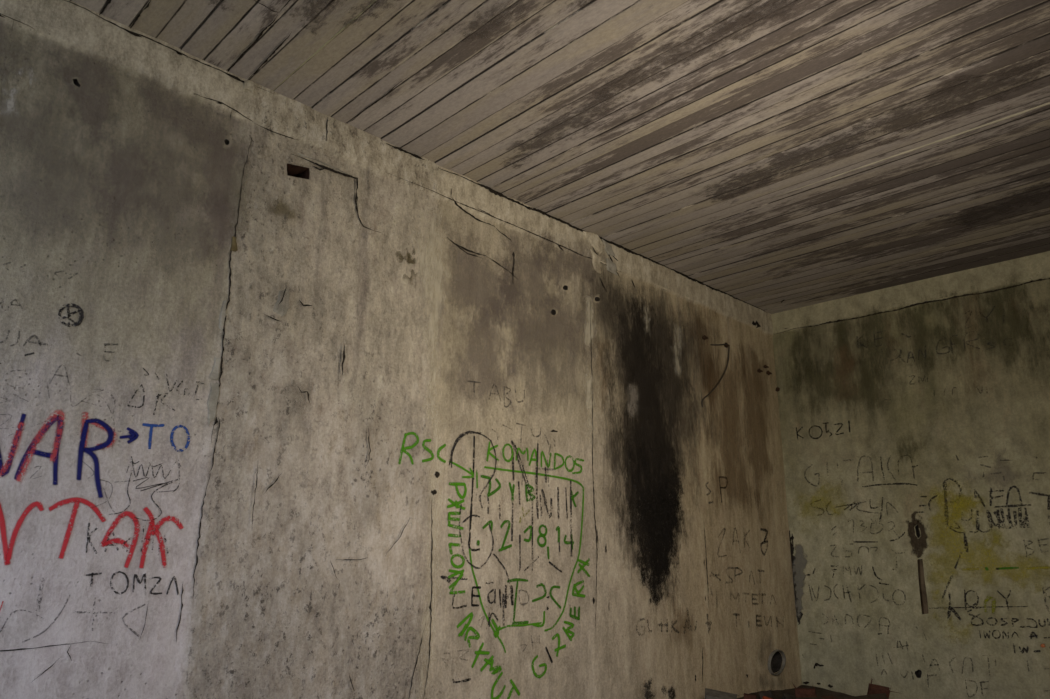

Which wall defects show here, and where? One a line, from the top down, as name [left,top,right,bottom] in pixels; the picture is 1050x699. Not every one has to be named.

leakage [505,0,802,168]
leakage [705,60,1045,202]
crack [64,0,381,641]
leakage [628,385,638,415]
crack [0,641,106,681]